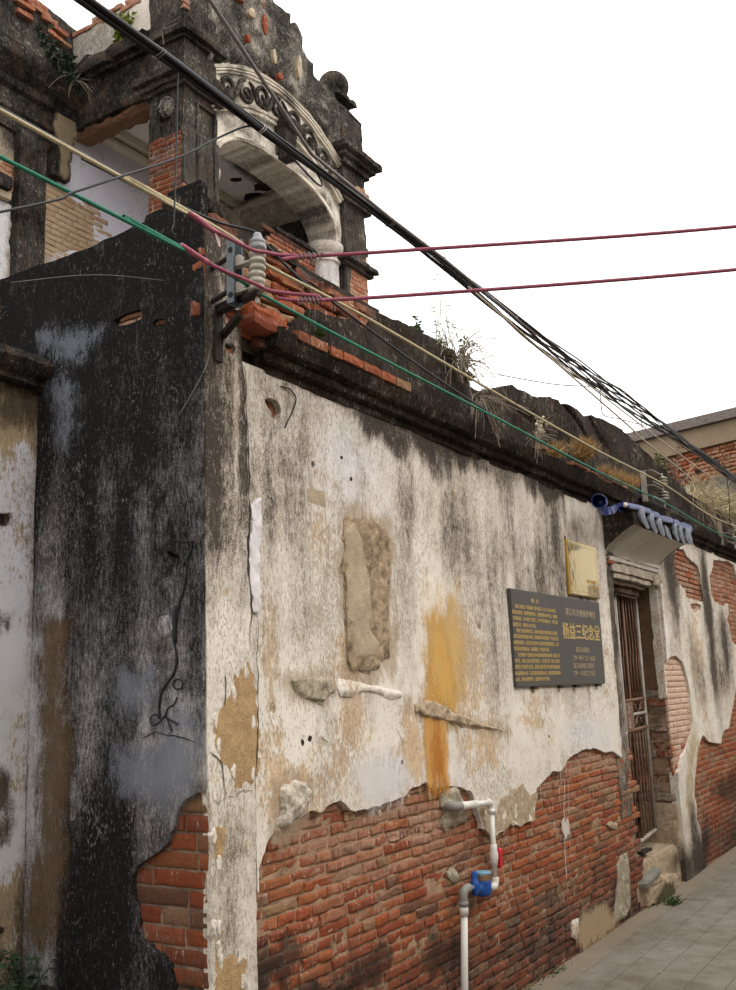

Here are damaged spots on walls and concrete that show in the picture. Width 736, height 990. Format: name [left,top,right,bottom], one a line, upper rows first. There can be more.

flaking render [148,130,187,214]
leakage [36,328,103,363]
flaking render [674,549,736,645]
leakage [0,768,13,846]
leakage [23,615,77,957]
leakage [109,710,203,819]
peeling [213,661,261,789]
corrosion [423,584,466,794]
flaking render [664,656,691,776]
flaking render [694,692,736,867]
flaking render [136,748,645,990]